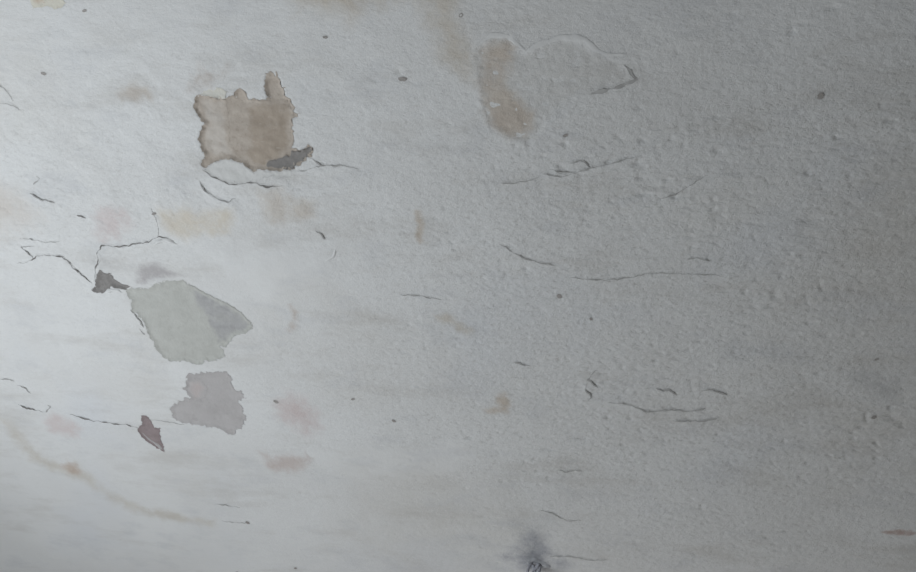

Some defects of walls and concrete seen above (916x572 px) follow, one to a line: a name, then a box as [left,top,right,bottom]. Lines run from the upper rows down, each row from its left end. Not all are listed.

flaking render [193,71,313,185]
damp [274,0,481,95]
peeling [474,32,639,152]
crack [501,157,635,184]
crack [17,209,176,282]
peeling [92,257,253,435]
peeling [137,416,164,452]